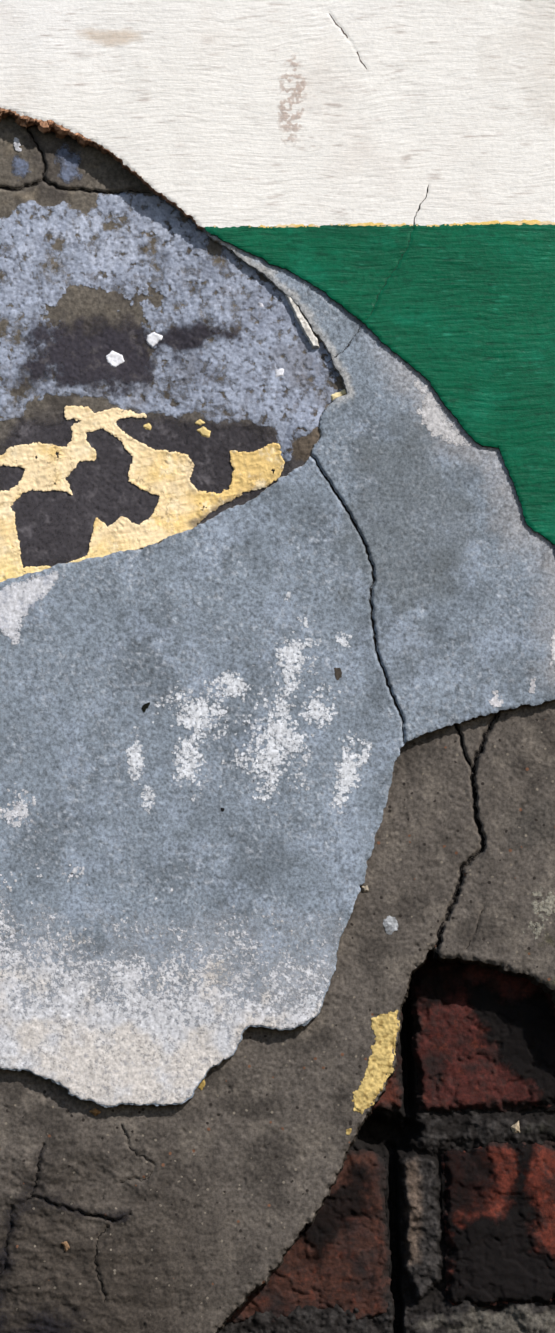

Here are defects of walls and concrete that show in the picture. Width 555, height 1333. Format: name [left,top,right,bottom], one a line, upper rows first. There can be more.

crack [0,127,150,195]
peeling [0,108,337,461]
flaking render [0,231,555,1060]
crack [313,457,404,742]
crack [433,715,496,958]
crack [0,1147,130,1302]
crack [120,1126,153,1183]
flaking render [0,699,555,1333]